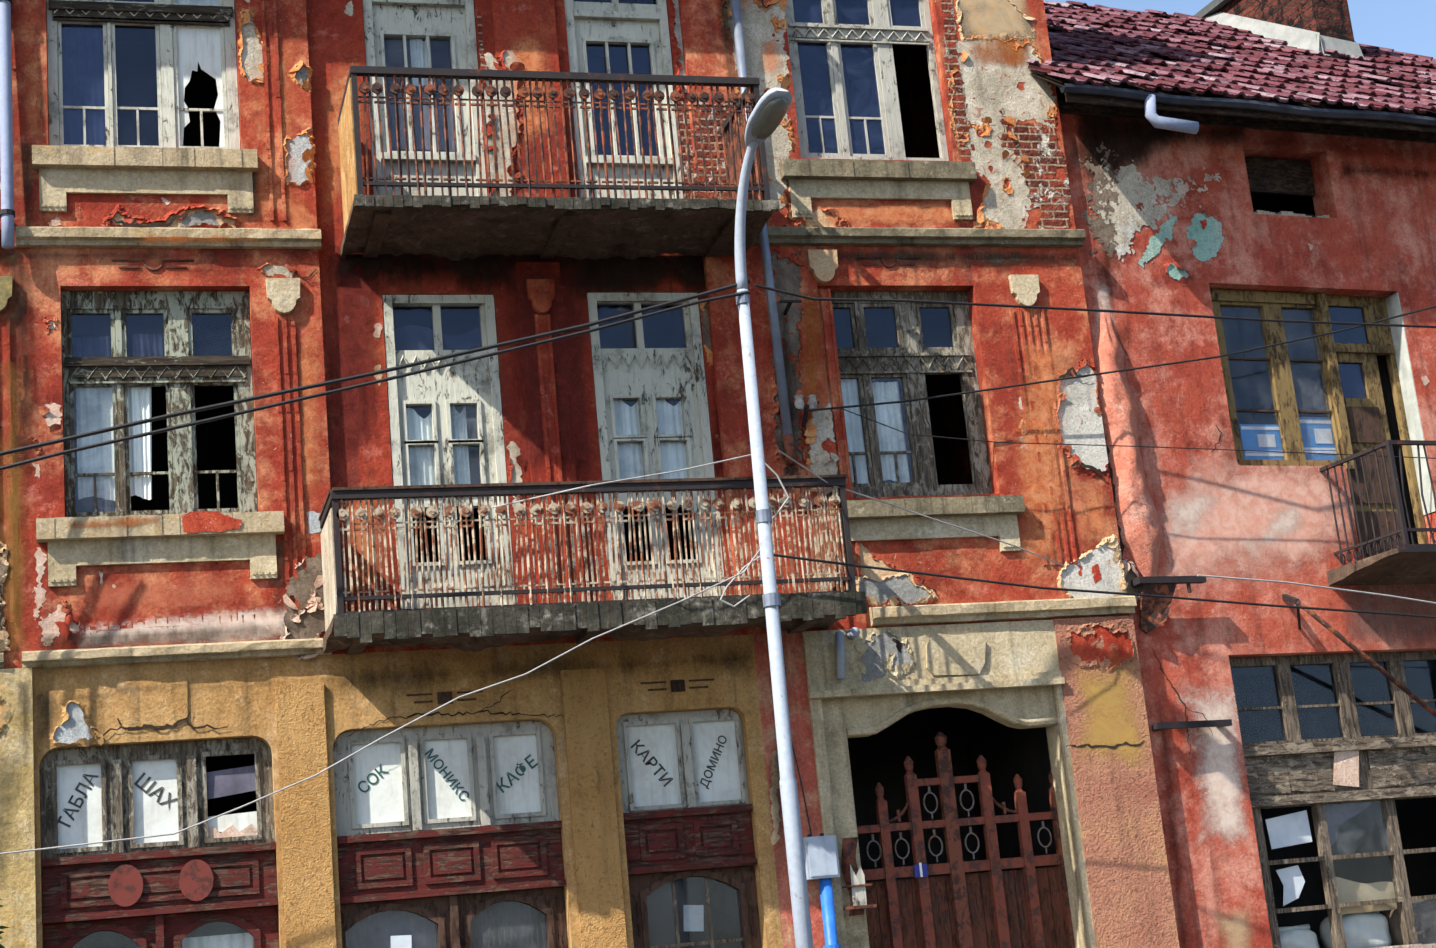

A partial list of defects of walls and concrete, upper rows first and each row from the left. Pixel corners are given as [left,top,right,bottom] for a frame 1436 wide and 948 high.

peeling [237,0,348,206]
peeling [668,0,791,199]
peeling [765,113,953,227]
peeling [940,0,1224,284]
damp [5,265,28,638]
spalling [49,699,104,747]
crack [97,711,228,739]
peeling [767,248,839,492]
peeling [854,628,917,682]
spalling [851,541,939,607]
spalling [1018,352,1141,602]
peeling [1065,620,1138,758]